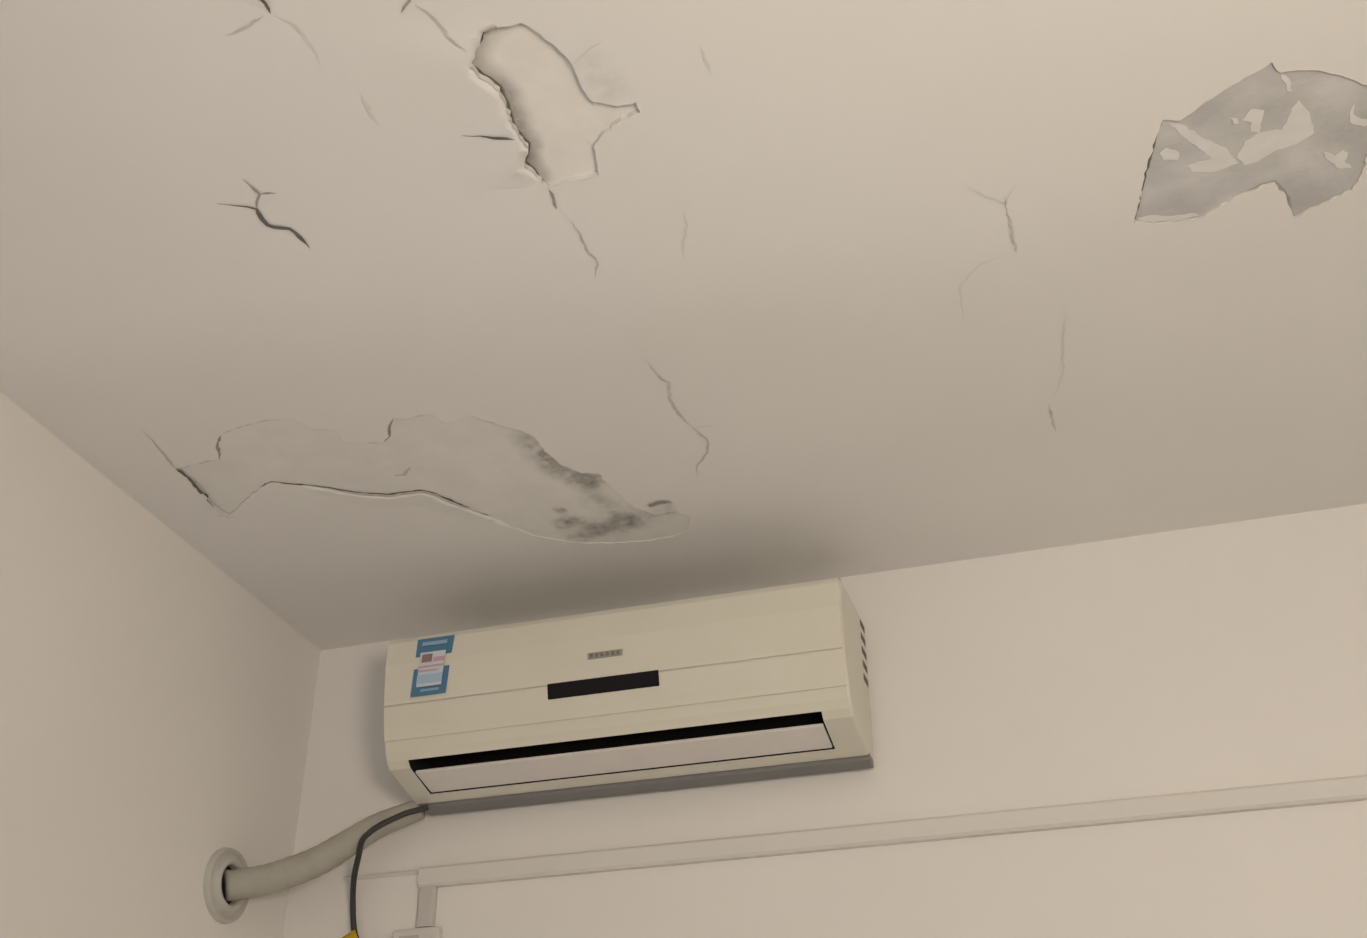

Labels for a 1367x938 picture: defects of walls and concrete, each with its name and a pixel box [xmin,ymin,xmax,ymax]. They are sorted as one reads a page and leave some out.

crack [228,0,321,67]
peeling [364,4,640,209]
peeling [1134,63,1367,224]
crack [223,179,310,248]
peeling [140,414,690,544]
crack [646,361,712,477]